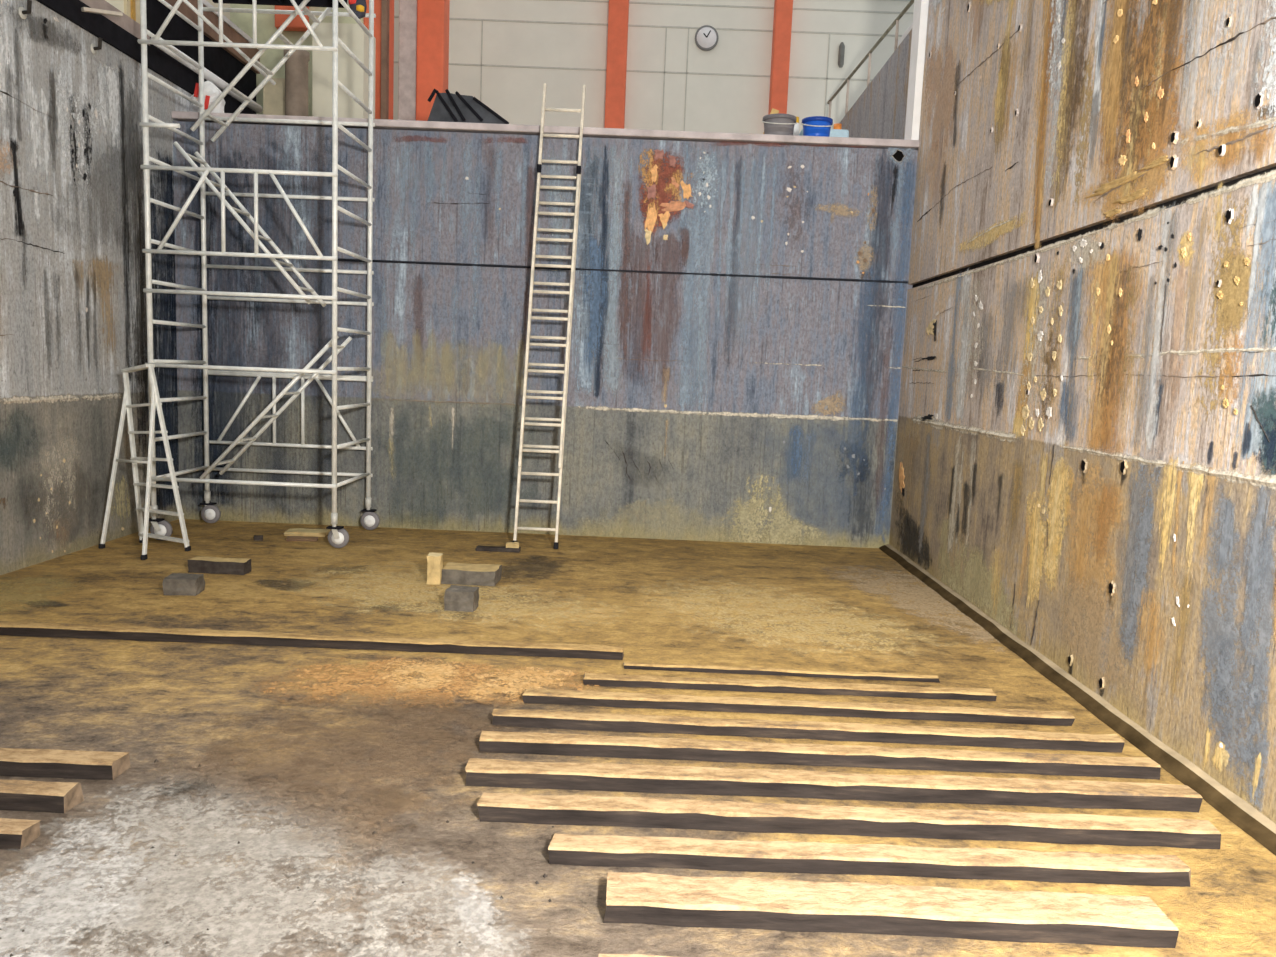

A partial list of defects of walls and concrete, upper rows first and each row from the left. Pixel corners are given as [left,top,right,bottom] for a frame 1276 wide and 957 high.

leakage [0,17,65,237]
leakage [953,65,961,146]
rust [960,0,1276,252]
leakage [0,393,122,468]
leakage [97,63,222,511]
leakage [372,399,515,455]
rust [619,183,657,371]
rust [681,229,689,265]
leakage [573,144,1276,807]
rust [1009,453,1074,609]
rust [1084,249,1137,451]
rust [1173,185,1253,419]